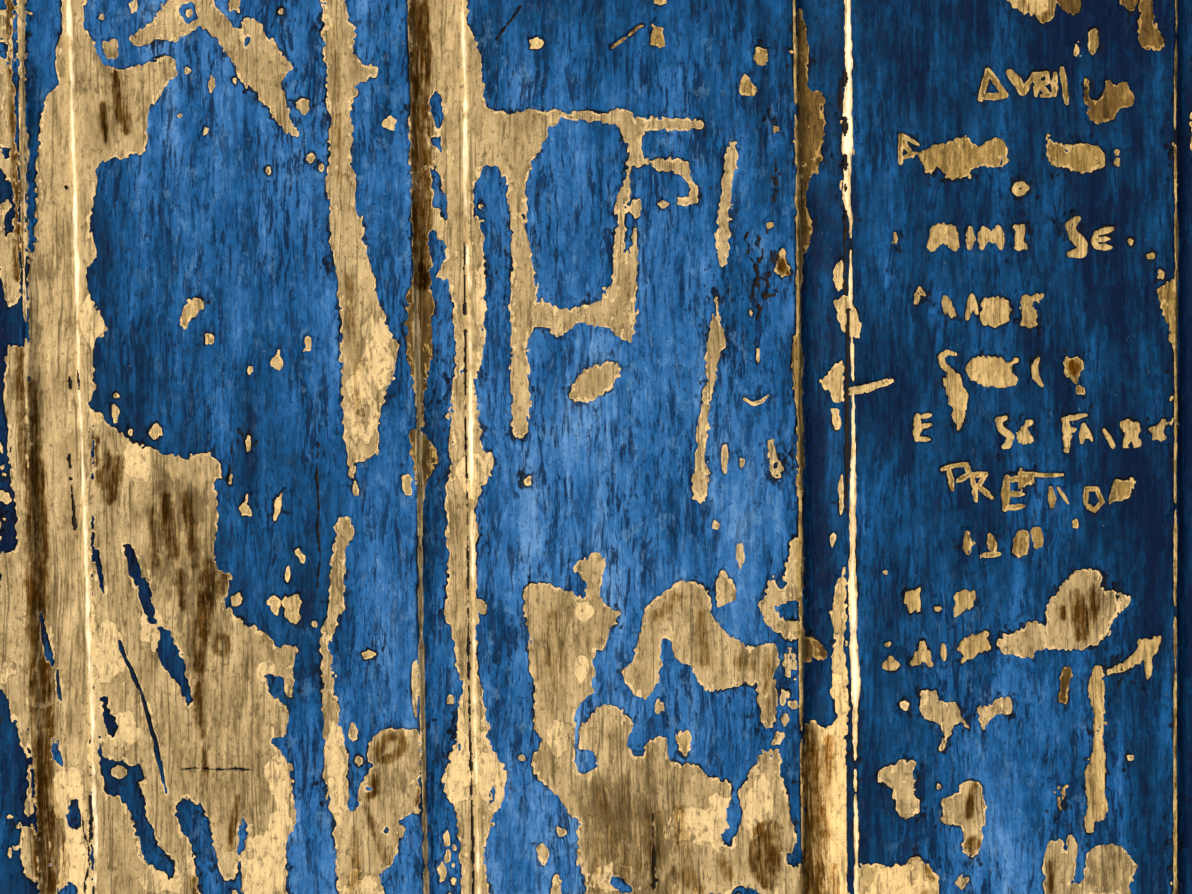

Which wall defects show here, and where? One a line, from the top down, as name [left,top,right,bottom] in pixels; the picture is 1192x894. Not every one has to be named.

peeling [714,141,738,267]
peeling [833,260,862,338]
peeling [0,0,309,894]
peeling [306,0,704,894]
peeling [691,297,745,503]
peeling [819,360,894,430]
peeling [997,568,1131,659]
peeling [267,516,423,894]
peeling [518,538,939,894]
peeling [900,690,1012,751]
peeling [937,781,987,857]
peeling [1042,835,1137,894]